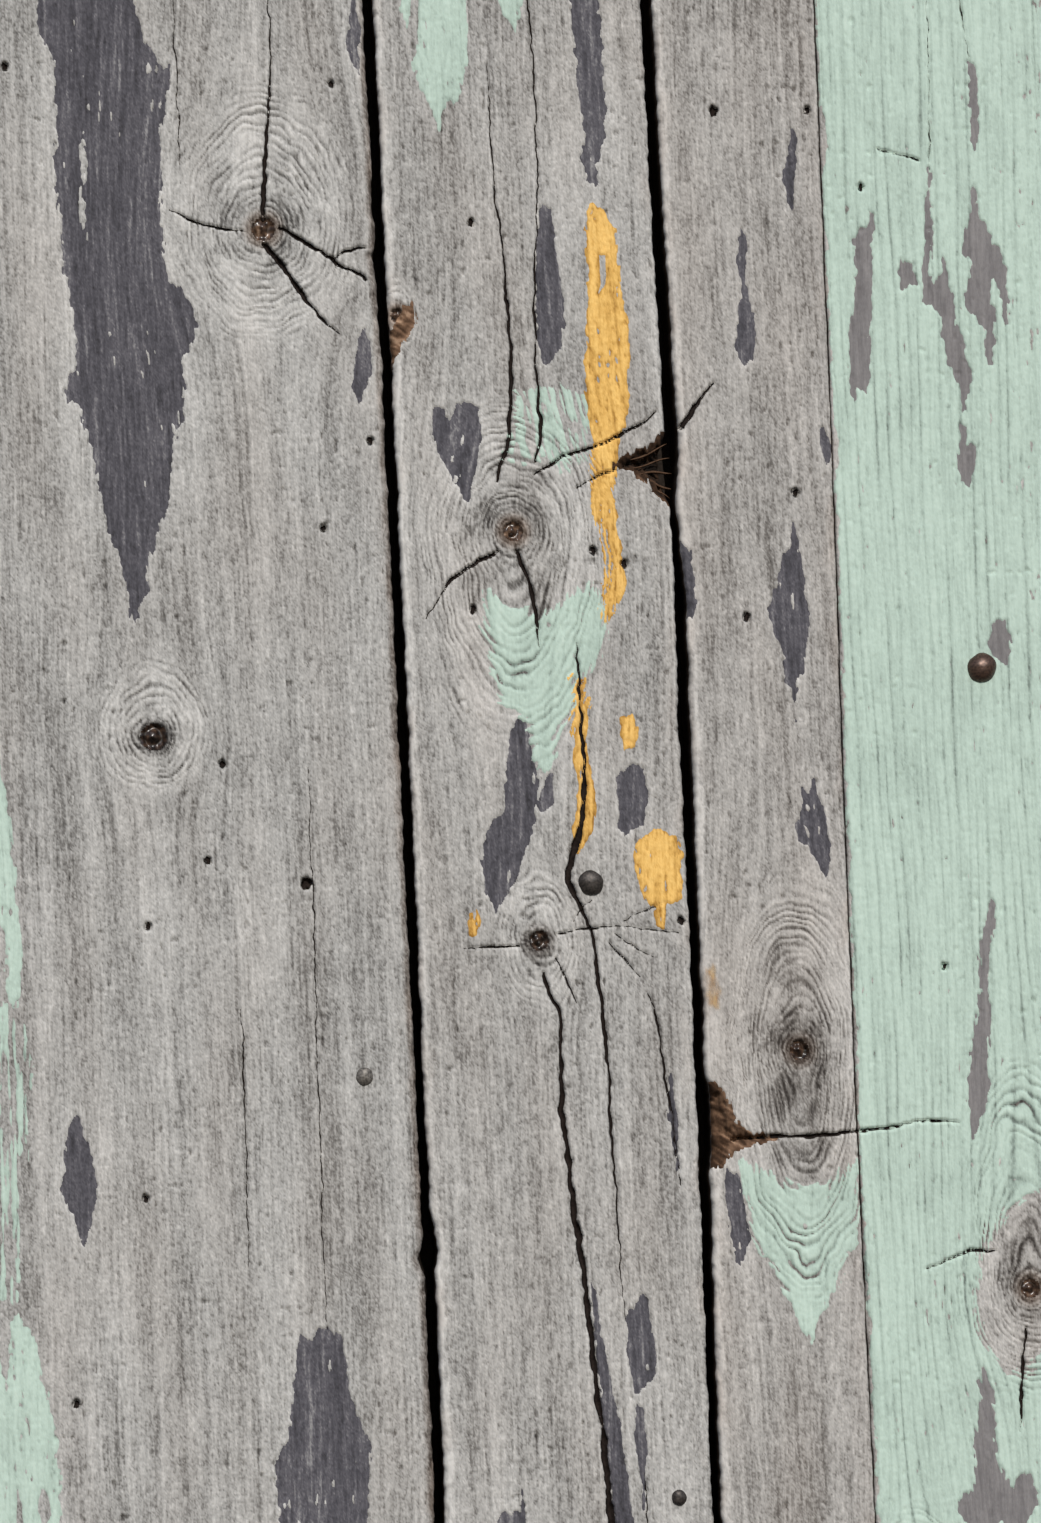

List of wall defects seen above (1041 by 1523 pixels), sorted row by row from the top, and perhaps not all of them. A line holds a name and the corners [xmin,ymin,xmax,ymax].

peeling [36,0,199,622]
crack [172,0,367,334]
peeling [432,401,482,502]
crack [425,550,540,648]
peeling [467,0,631,937]
crack [486,0,714,488]
peeling [616,714,684,930]
peeling [724,0,1041,1523]
crack [542,642,681,1523]
crack [731,1119,960,1142]
peeling [275,1327,372,1523]
crack [1019,1328,1027,1423]